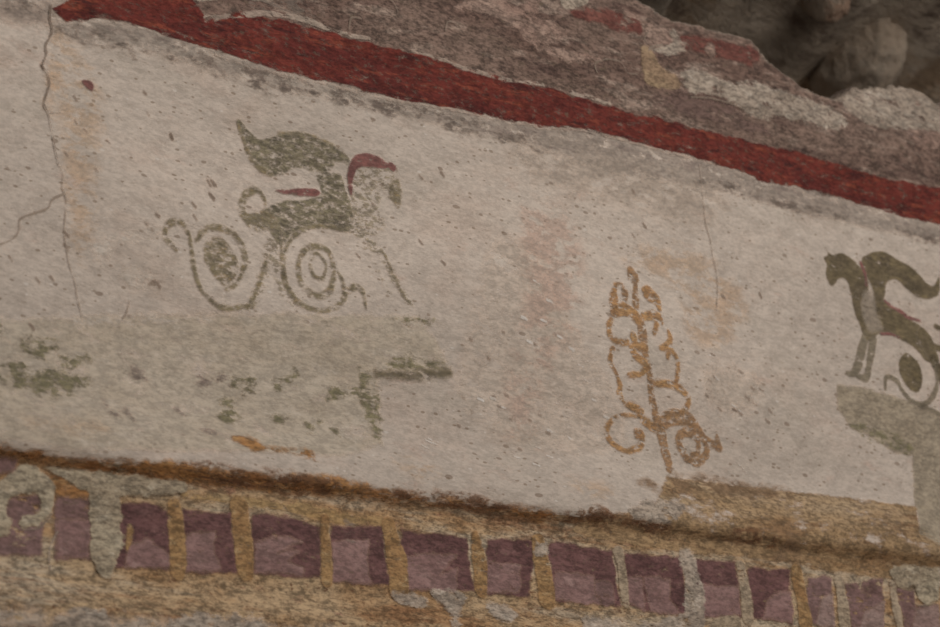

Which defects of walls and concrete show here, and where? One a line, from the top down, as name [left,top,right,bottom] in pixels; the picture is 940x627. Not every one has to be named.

peeling [453,0,603,65]
peeling [623,9,940,150]
crack [0,5,81,309]